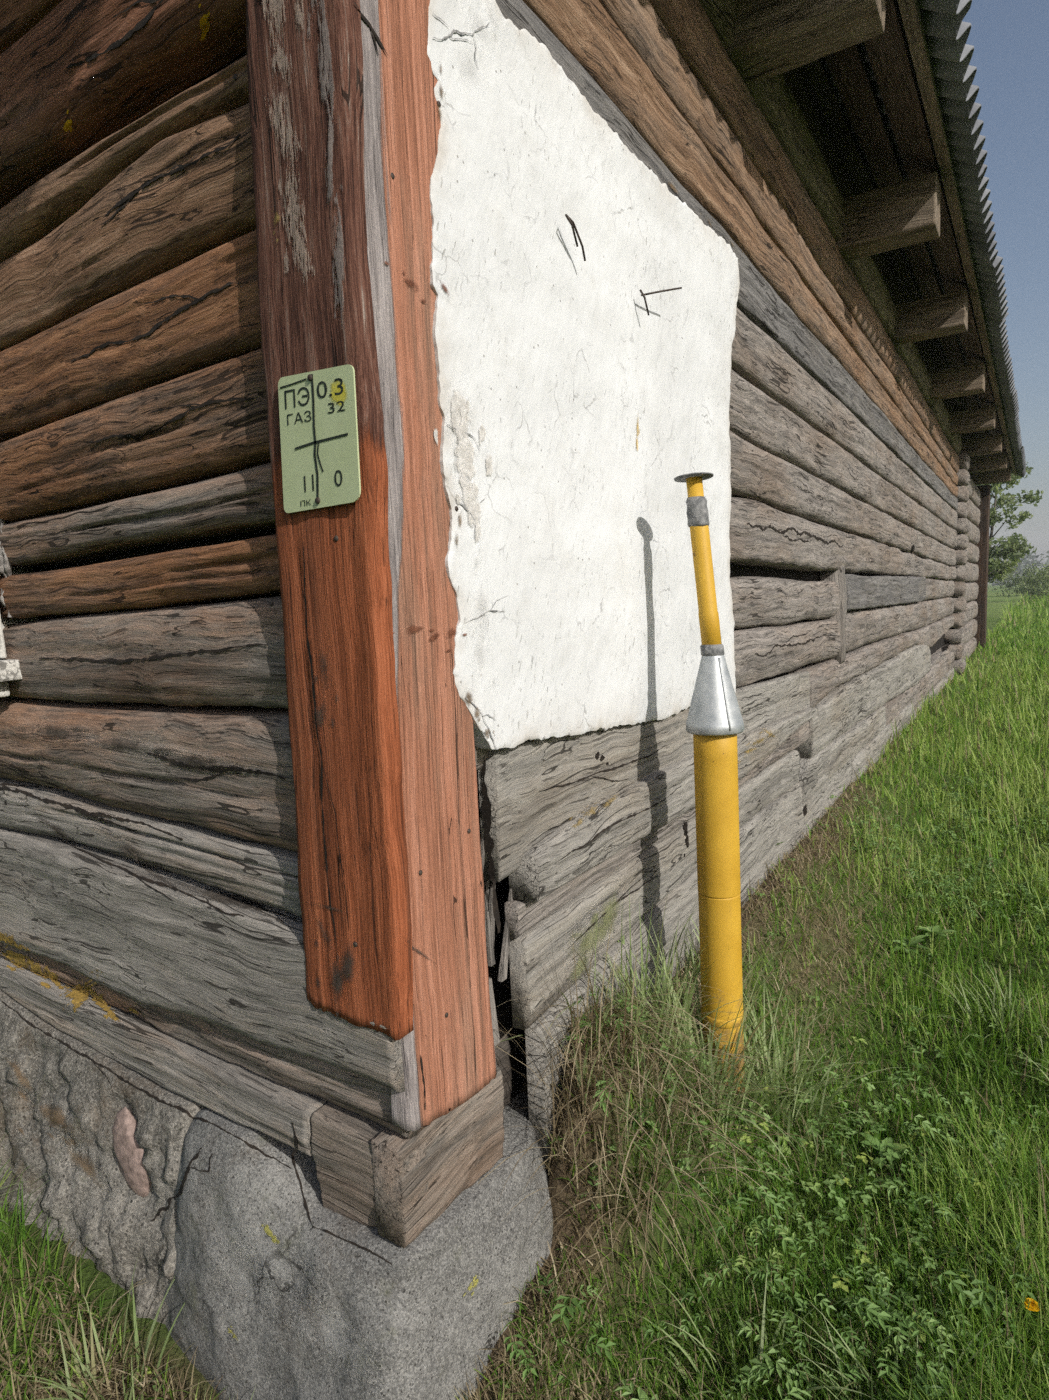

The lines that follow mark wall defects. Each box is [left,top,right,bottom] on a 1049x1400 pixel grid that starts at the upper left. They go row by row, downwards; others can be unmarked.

flaking render [434,390,493,542]
crack [2,1001,392,1265]